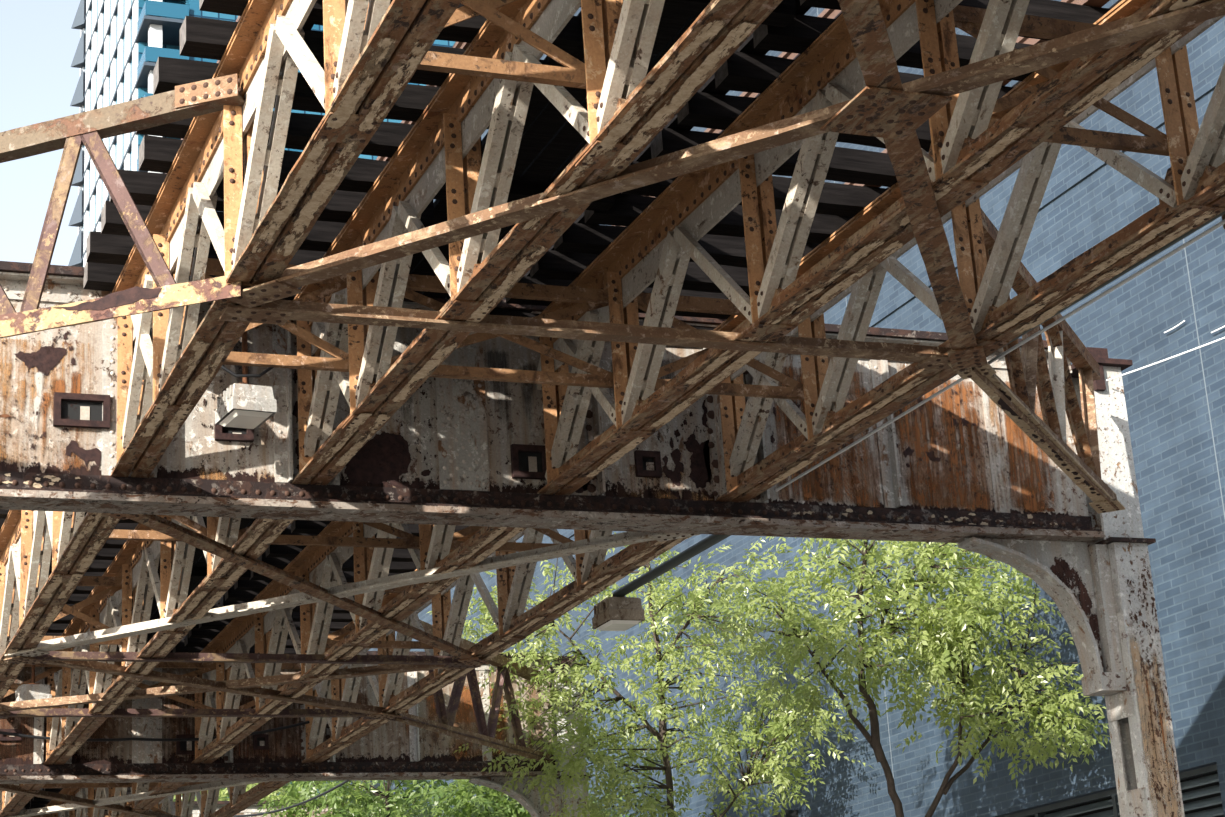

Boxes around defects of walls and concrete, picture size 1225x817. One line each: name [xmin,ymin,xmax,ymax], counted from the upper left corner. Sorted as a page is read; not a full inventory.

peeling [1063,30,1181,117]
peeling [934,127,1030,201]
peeling [53,286,162,310]
peeling [767,239,902,324]
rust [0,338,96,471]
peeling [0,326,102,488]
rust [202,469,225,480]
peeling [575,337,770,501]
rust [775,366,806,449]
rust [779,426,882,507]
rust [895,380,1055,512]
rust [1130,637,1181,817]